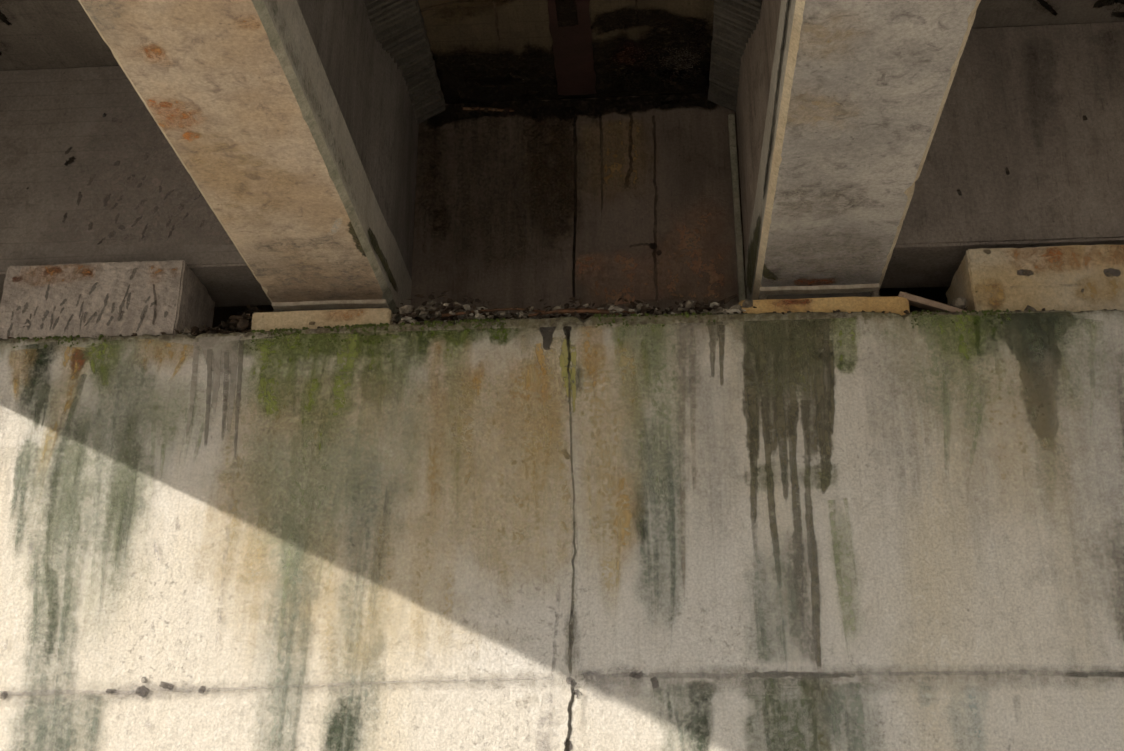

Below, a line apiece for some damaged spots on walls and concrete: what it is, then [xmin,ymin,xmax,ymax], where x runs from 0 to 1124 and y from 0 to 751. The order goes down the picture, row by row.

water stain [12,440,38,543]
water stain [21,340,159,749]
water stain [154,328,518,751]
crack [542,113,662,751]
water stain [616,324,696,584]
water stain [706,322,725,385]
water stain [743,318,866,751]
water stain [918,312,1096,452]